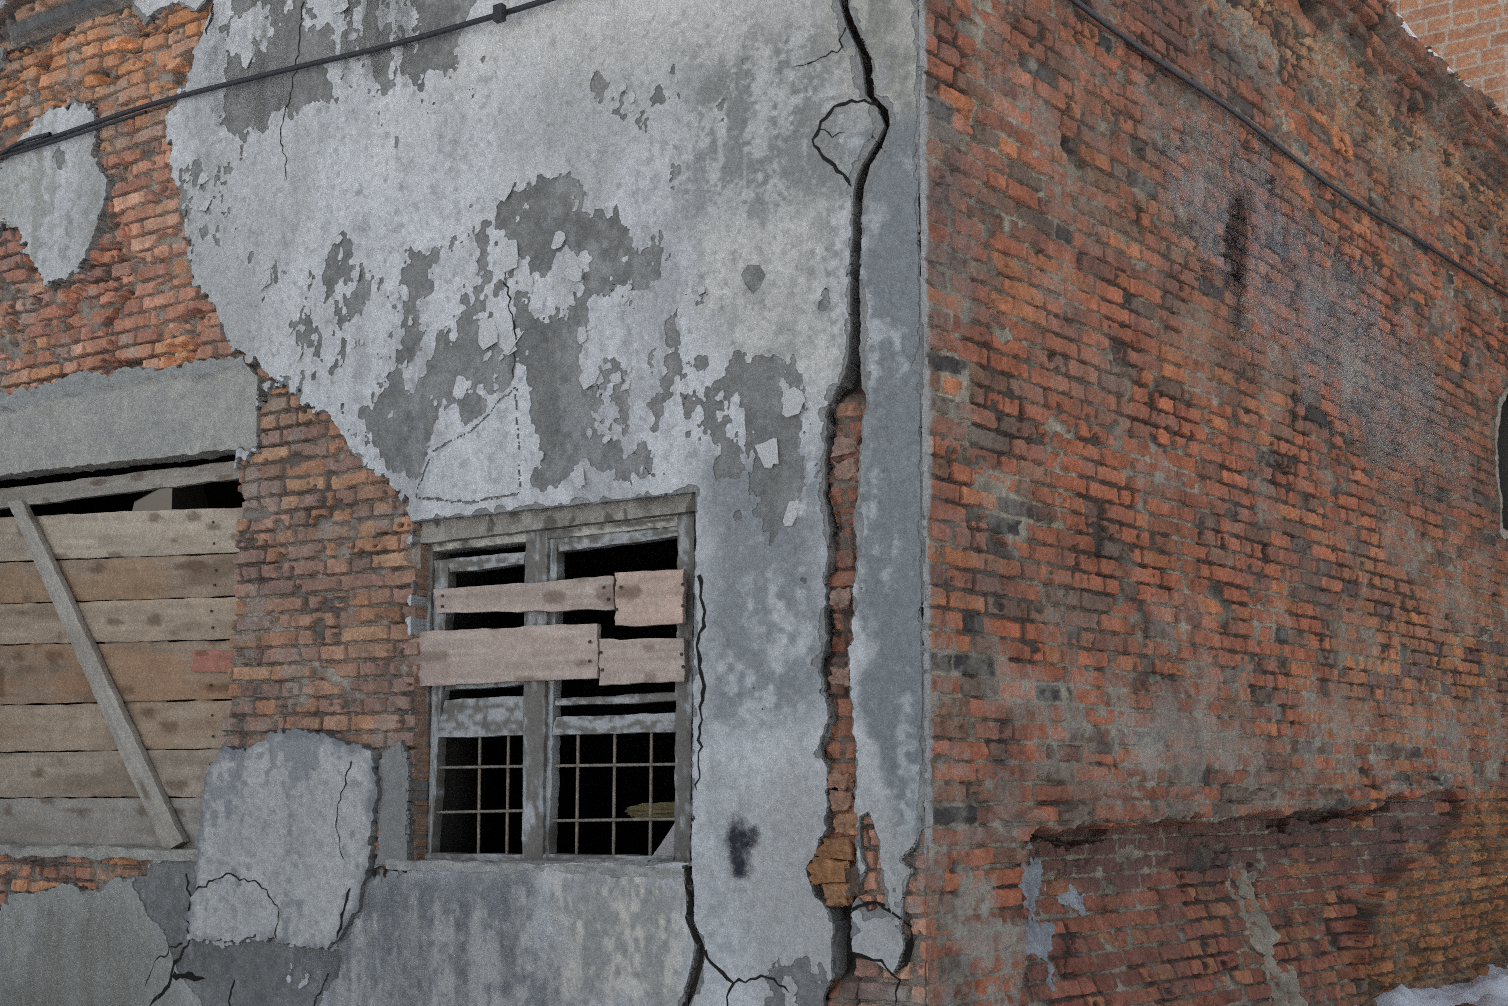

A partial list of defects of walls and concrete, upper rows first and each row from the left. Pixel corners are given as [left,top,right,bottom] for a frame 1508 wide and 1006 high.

crack [794,7,890,202]
spalling [0,0,942,1006]
crack [694,574,706,790]
crack [807,363,914,1006]
crack [145,873,279,1006]
crack [313,973,329,1006]
crack [335,761,352,937]
crack [682,861,789,1006]
spalling [1019,783,1508,1006]